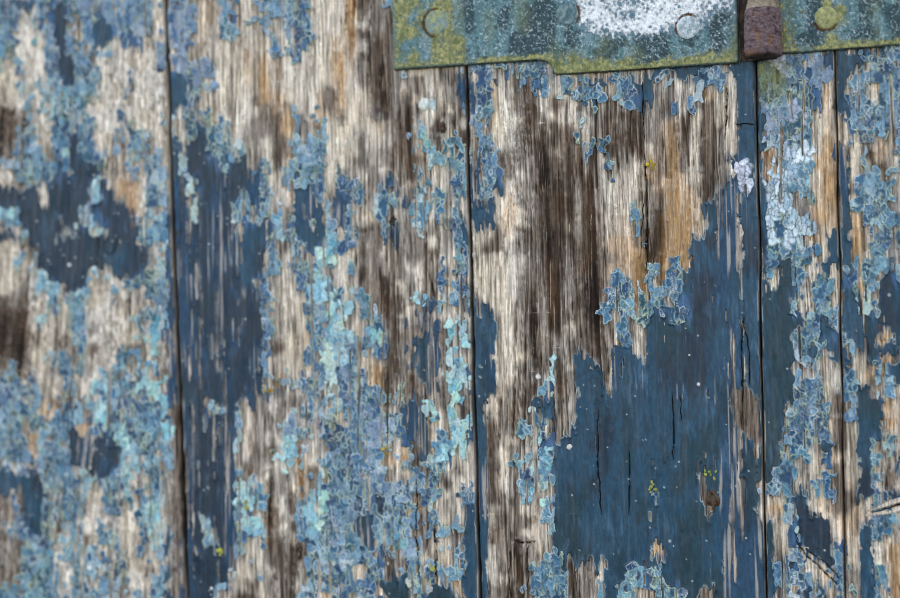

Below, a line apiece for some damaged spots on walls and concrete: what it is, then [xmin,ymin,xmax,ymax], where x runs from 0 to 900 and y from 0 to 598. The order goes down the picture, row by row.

peeling [0,0,554,598]
peeling [508,46,900,598]